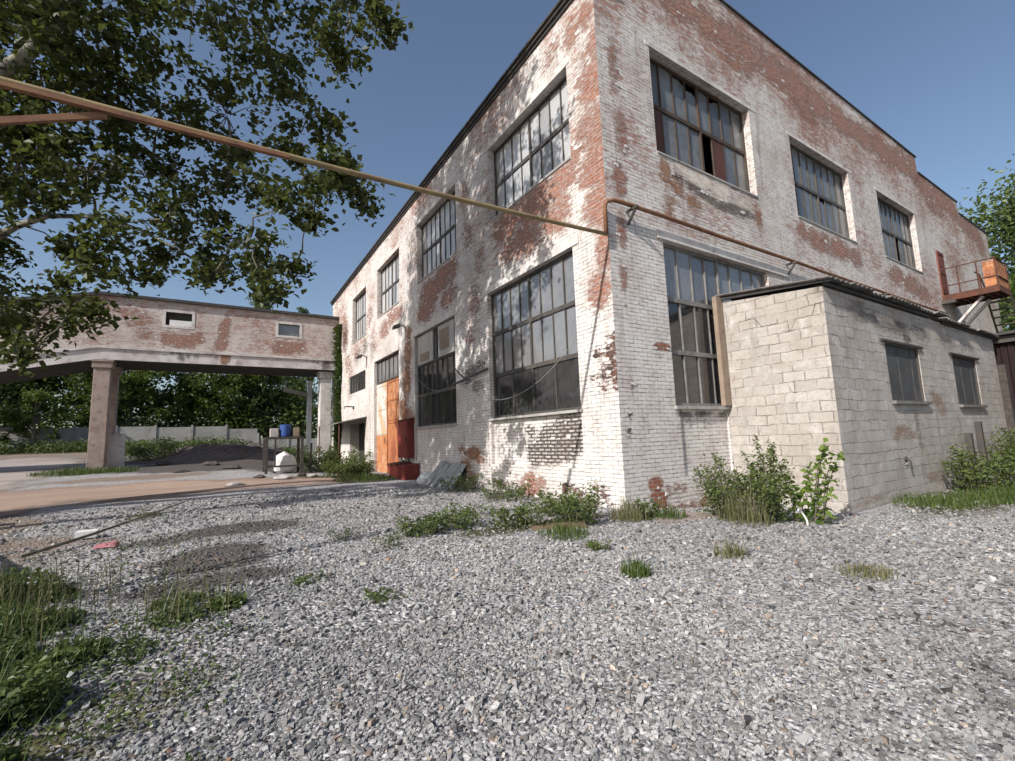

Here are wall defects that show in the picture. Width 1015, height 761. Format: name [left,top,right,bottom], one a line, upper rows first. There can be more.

peeling [659,0,986,256]
peeling [492,3,629,308]
peeling [416,178,485,347]
peeling [796,220,864,271]
peeling [884,263,932,305]
peeling [118,304,232,351]
peeling [273,339,305,354]
peeling [367,305,404,338]
spalling [589,327,618,393]
spalling [514,413,614,508]
peeling [647,477,711,508]